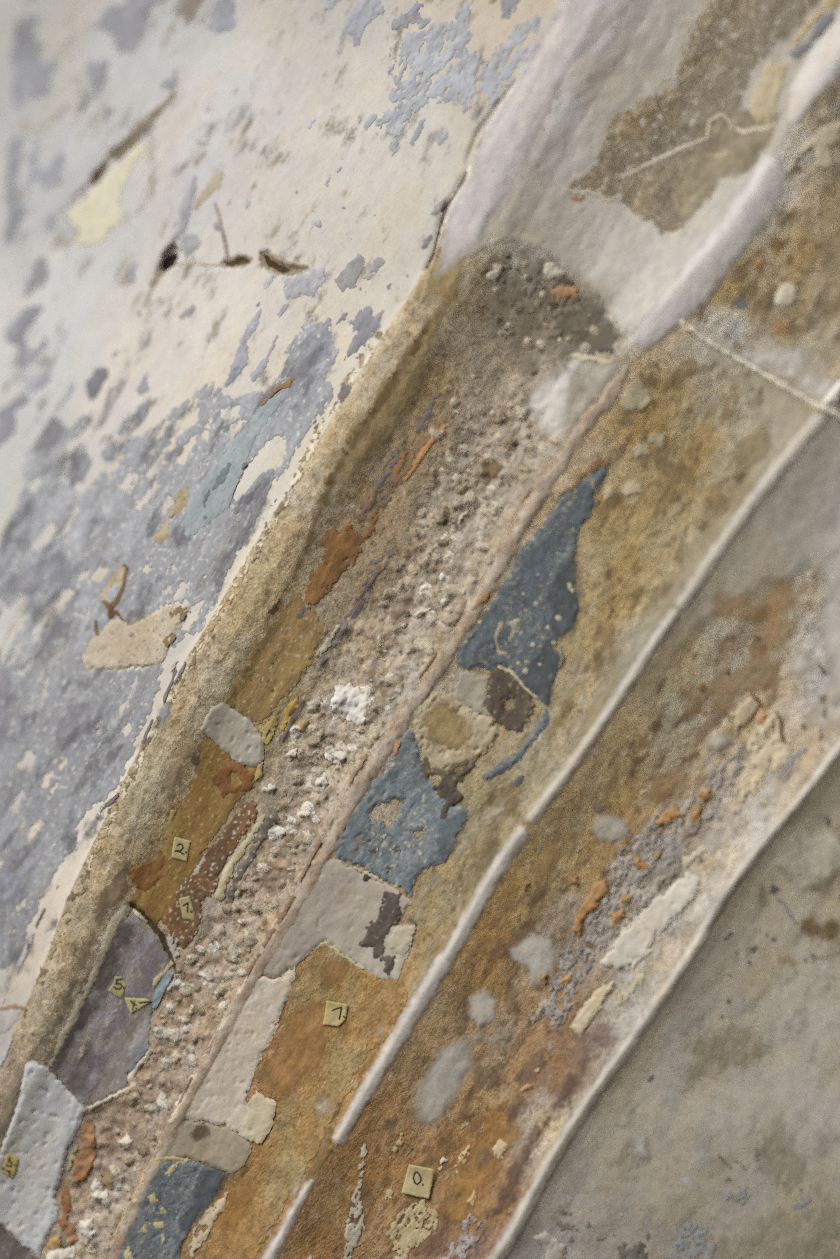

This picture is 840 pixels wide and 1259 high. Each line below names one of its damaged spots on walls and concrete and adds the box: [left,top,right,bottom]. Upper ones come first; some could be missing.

peeling [323,0,540,156]
crack [420,128,489,303]
crack [564,112,776,203]
crack [664,223,684,232]
peeling [0,256,51,444]
water stain [293,258,461,666]
peeling [0,304,384,969]
peeling [335,466,607,976]
crack [130,904,177,974]
peeling [46,735,286,1112]
peeling [525,693,808,1037]
peeling [386,1199,442,1259]